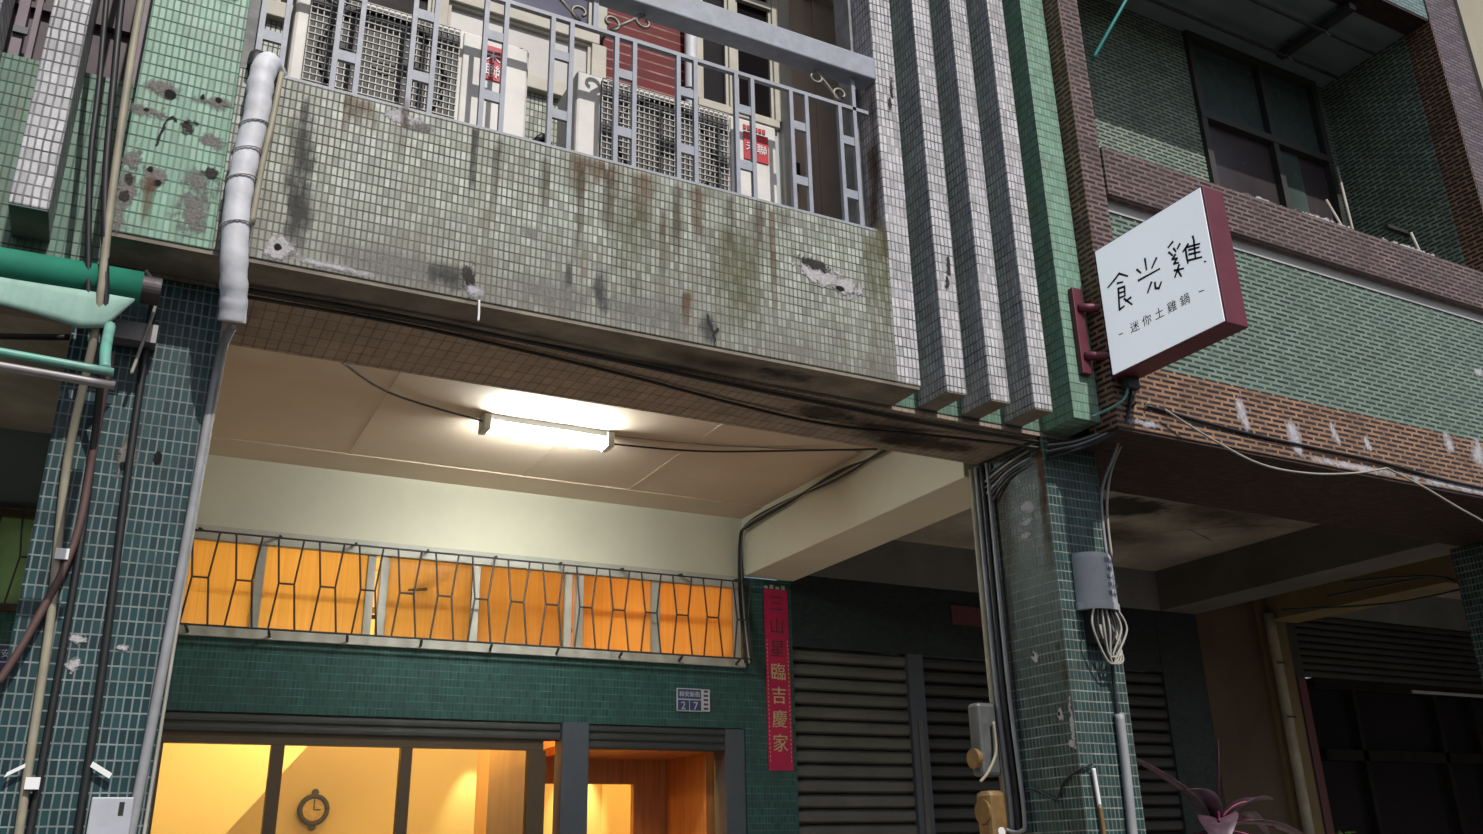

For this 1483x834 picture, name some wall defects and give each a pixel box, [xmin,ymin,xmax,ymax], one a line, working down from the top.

spalling [130,81,230,150]
spalling [113,150,220,231]
corrosion [662,189,680,236]
leakage [431,265,459,284]
leakage [595,276,605,307]
spalling [792,255,862,300]